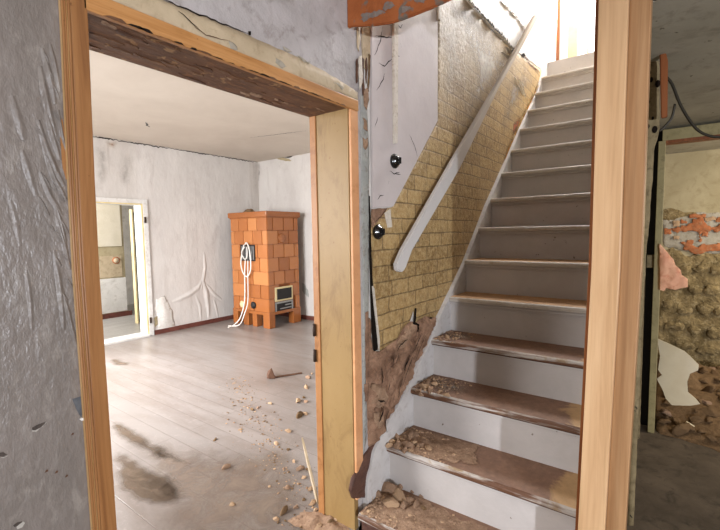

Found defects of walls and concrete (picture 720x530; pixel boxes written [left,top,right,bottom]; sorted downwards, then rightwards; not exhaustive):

crack [166,0,251,41]
crack [375,24,403,88]
spalling [356,0,437,454]
spalling [657,208,720,367]